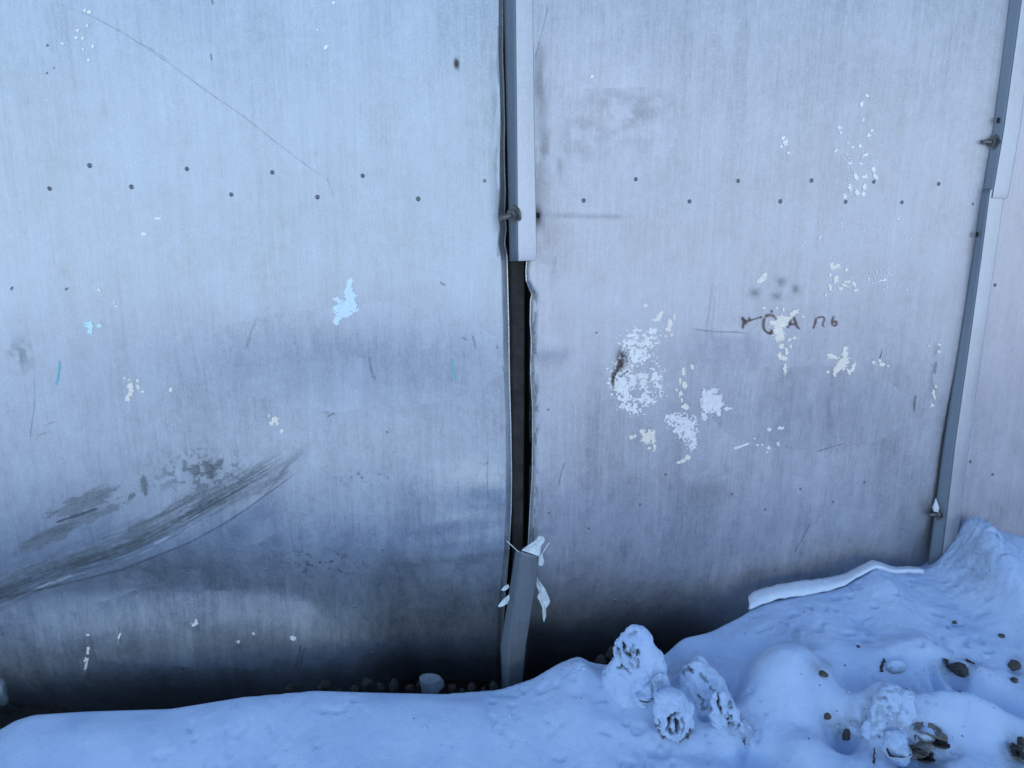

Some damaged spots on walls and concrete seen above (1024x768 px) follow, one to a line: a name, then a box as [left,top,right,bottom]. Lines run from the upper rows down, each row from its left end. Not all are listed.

peeling [834,94,878,200]
peeling [330,277,359,325]
corrosion [612,352,626,386]
peeling [601,304,732,464]
peeling [762,306,805,375]
peeling [826,346,856,377]
leakage [0,470,263,598]